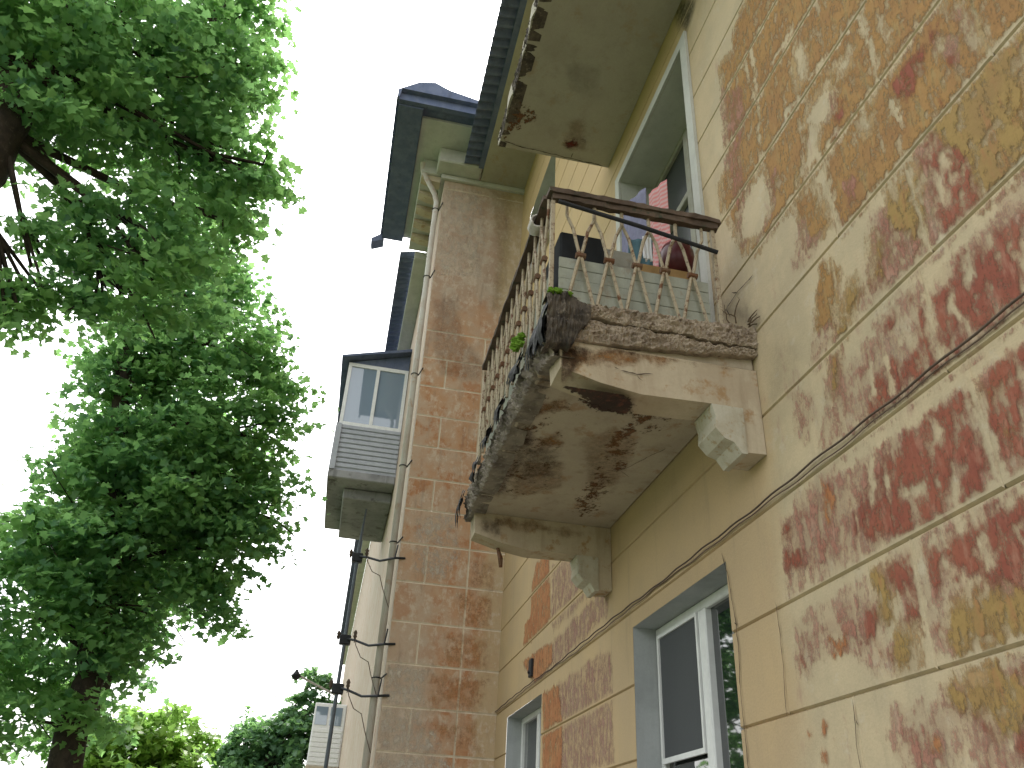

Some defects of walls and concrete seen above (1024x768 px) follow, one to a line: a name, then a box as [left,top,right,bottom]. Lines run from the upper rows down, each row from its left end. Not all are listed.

spalling [463,315,671,522]
peeling [523,559,613,768]
peeling [718,0,1024,449]
peeling [782,343,1024,768]